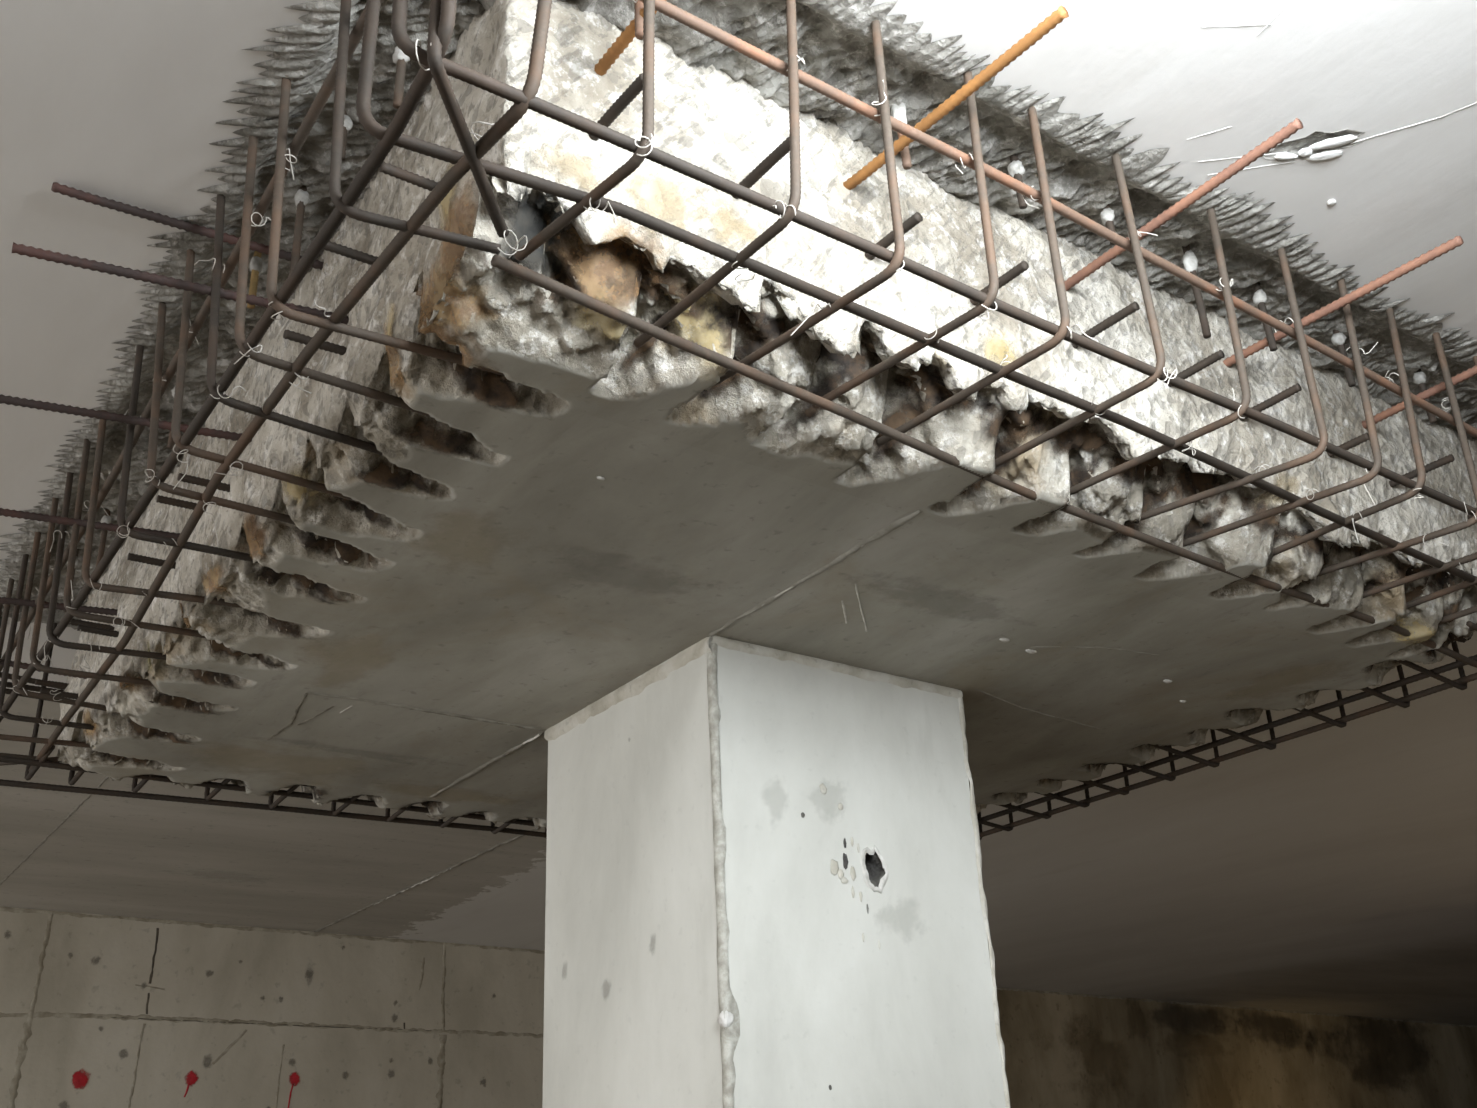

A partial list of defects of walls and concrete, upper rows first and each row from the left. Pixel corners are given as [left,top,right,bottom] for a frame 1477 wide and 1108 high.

rust [595,8,657,76]
rust [843,5,1069,190]
spalling [1262,129,1365,162]
spalling [488,175,565,230]
rust [1064,118,1303,291]
rust [416,186,528,410]
rust [390,418,479,458]
rust [545,218,1477,658]
rust [357,460,441,496]
rust [295,527,374,566]
rust [119,640,284,714]
spalling [57,193,1477,1108]